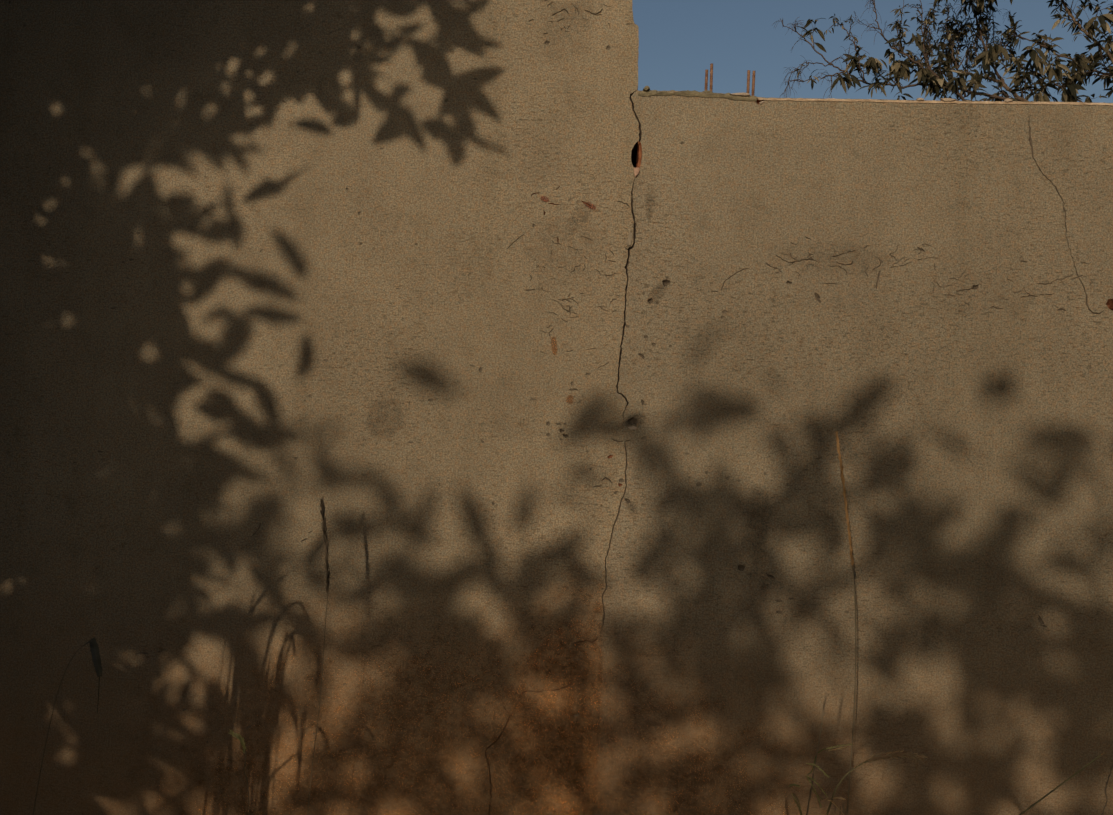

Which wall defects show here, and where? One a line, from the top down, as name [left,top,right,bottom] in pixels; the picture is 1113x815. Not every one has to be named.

crack [629,90,642,142]
spalling [631,141,642,178]
crack [713,118,1104,314]
crack [485,179,637,815]